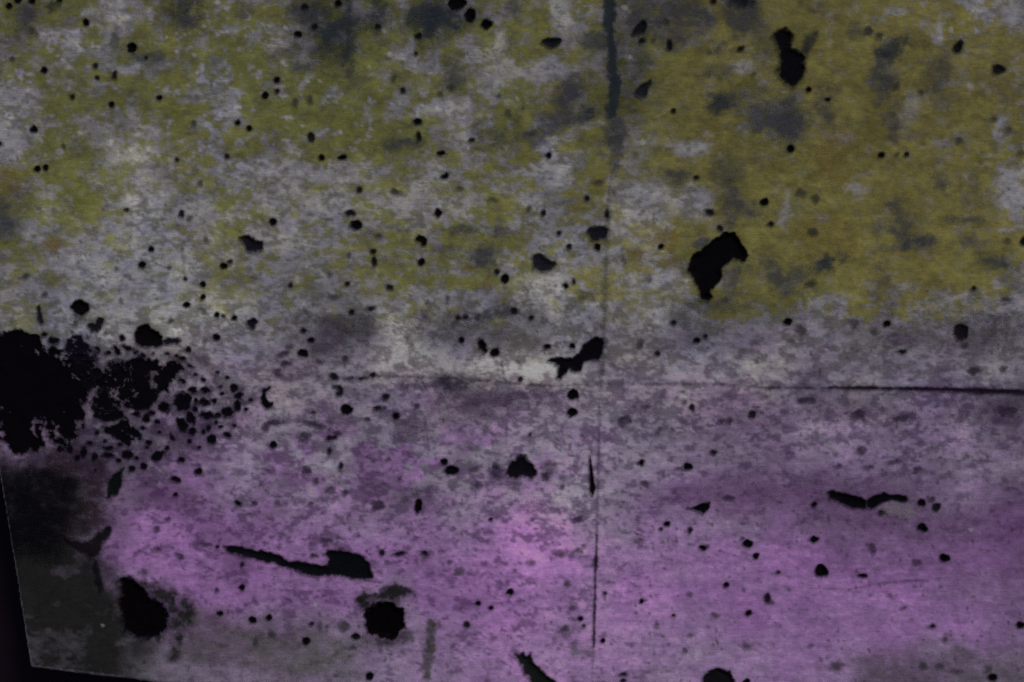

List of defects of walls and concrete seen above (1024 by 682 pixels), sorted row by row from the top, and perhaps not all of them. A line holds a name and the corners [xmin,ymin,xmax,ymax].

hole [771,26,820,89]
water stain [0,0,1024,340]
hole [133,323,182,348]
hole [547,336,610,380]
crack [293,216,1024,395]
hole [687,231,749,302]
water stain [0,291,1024,682]
hole [487,454,538,489]
hole [116,576,197,661]
hole [199,537,416,648]
crack [591,527,599,647]
hole [514,651,556,682]